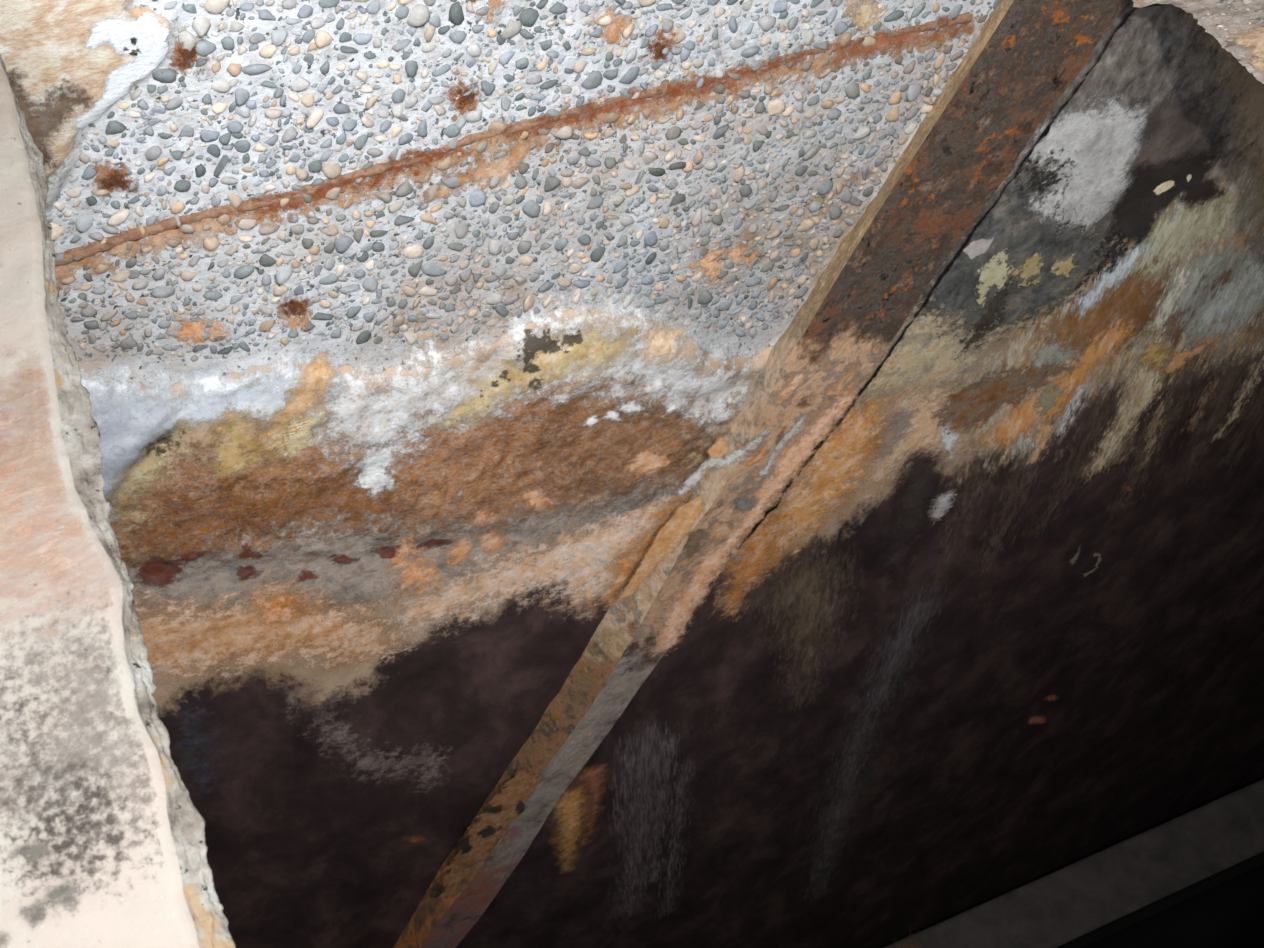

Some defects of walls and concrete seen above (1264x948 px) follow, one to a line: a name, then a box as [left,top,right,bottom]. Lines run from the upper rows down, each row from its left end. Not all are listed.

rust [278,294,312,333]
leakage [286,679,452,792]
rust [109,365,741,689]
leakage [80,276,804,625]
rust [55,0,975,289]
leakage [609,725,696,920]
leakage [750,550,854,706]
leakage [810,588,939,900]
crack [737,7,1137,549]
leakage [846,94,1264,519]
peeling [1154,174,1192,195]